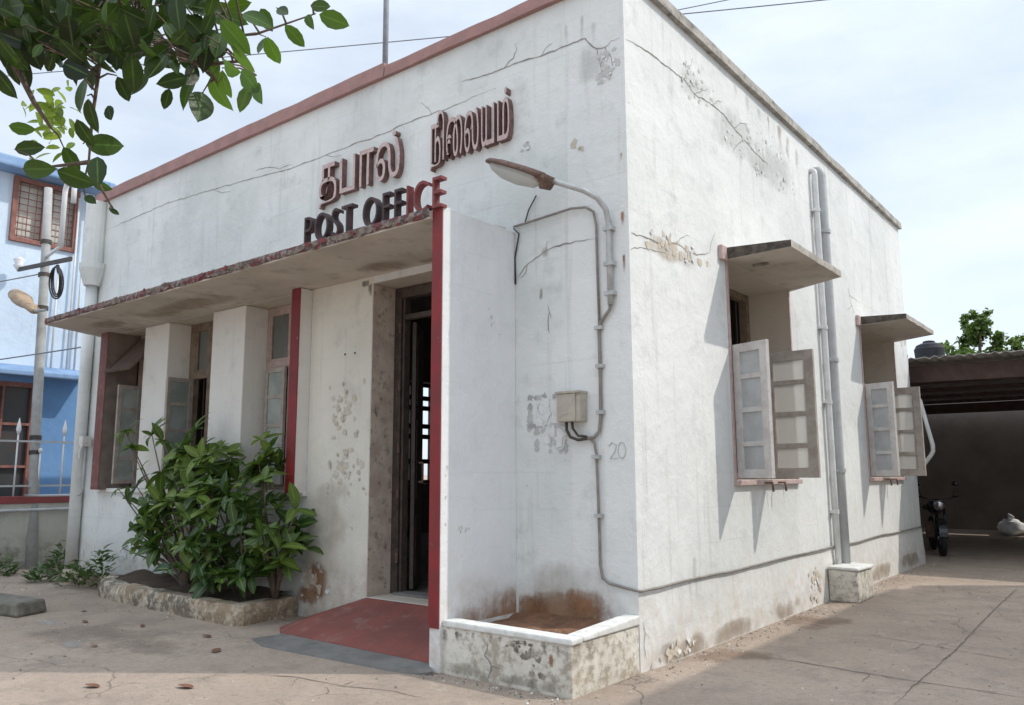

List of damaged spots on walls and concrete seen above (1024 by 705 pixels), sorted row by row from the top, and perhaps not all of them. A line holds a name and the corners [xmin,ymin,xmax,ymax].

peeling [595,47,620,85]
crack [107,38,769,230]
crack [519,239,589,278]
peeling [645,229,709,267]
peeling [325,378,367,496]
peeling [526,392,569,455]
peeling [300,561,330,604]
leakage [472,594,516,621]
peeling [651,638,697,669]